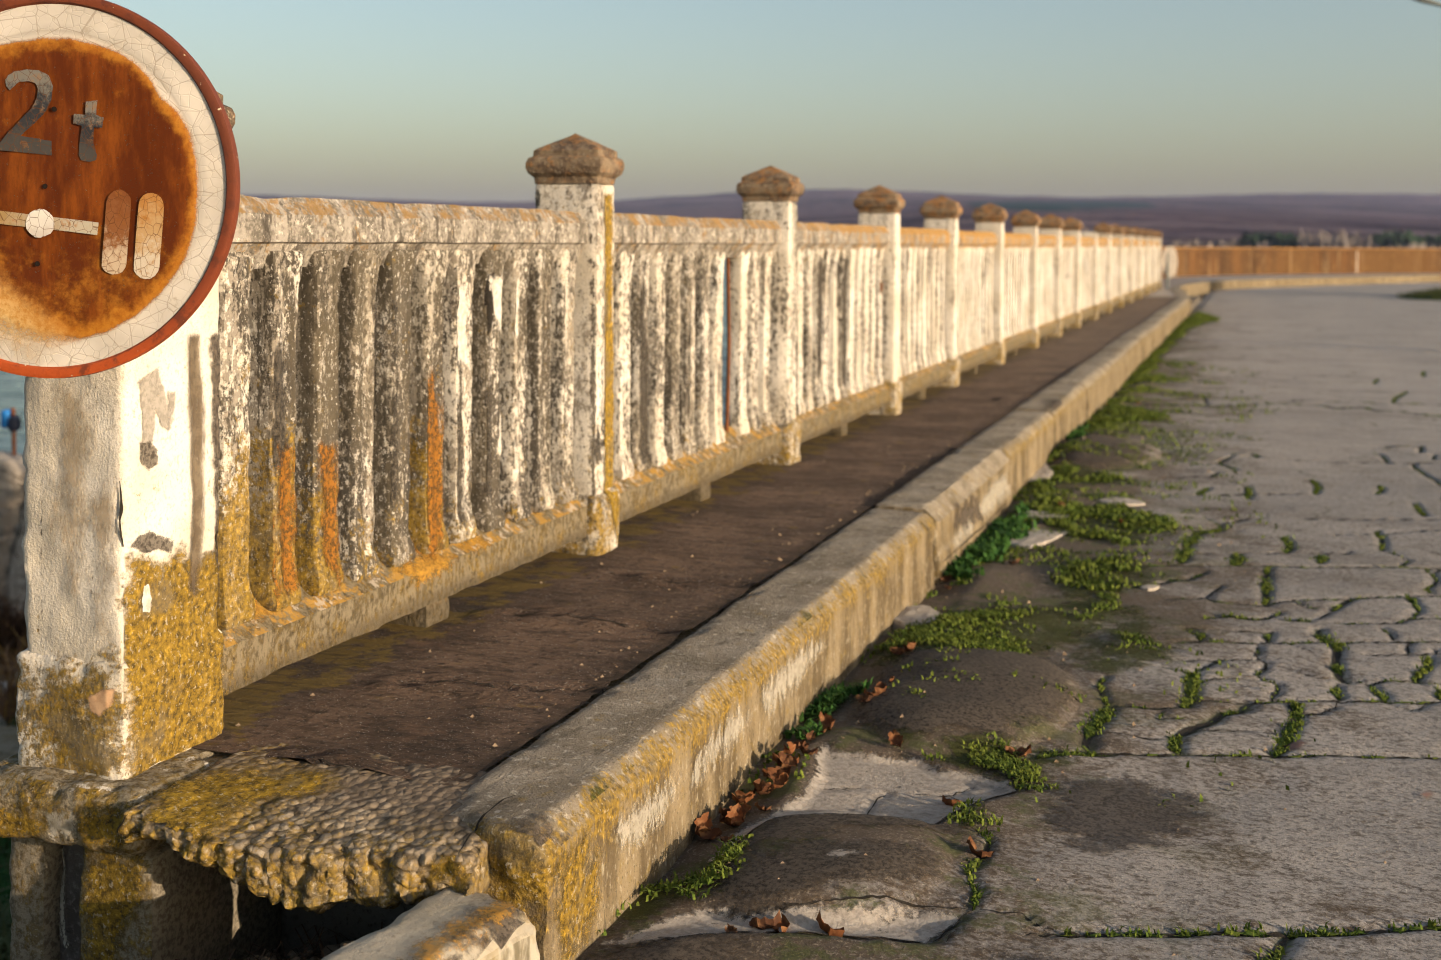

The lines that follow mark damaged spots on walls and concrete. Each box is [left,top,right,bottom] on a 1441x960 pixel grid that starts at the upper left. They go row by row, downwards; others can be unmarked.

rust [0,37,198,342]
crack [0,468,25,600]
mould [272,342,289,476]
rust [318,442,343,585]
rust [411,372,444,564]
mould [443,362,493,524]
water stain [638,283,652,465]
water stain [815,255,848,387]
crack [1035,371,1441,760]
spalling [604,901,958,947]
spalling [708,745,1016,862]
crack [709,788,1441,960]